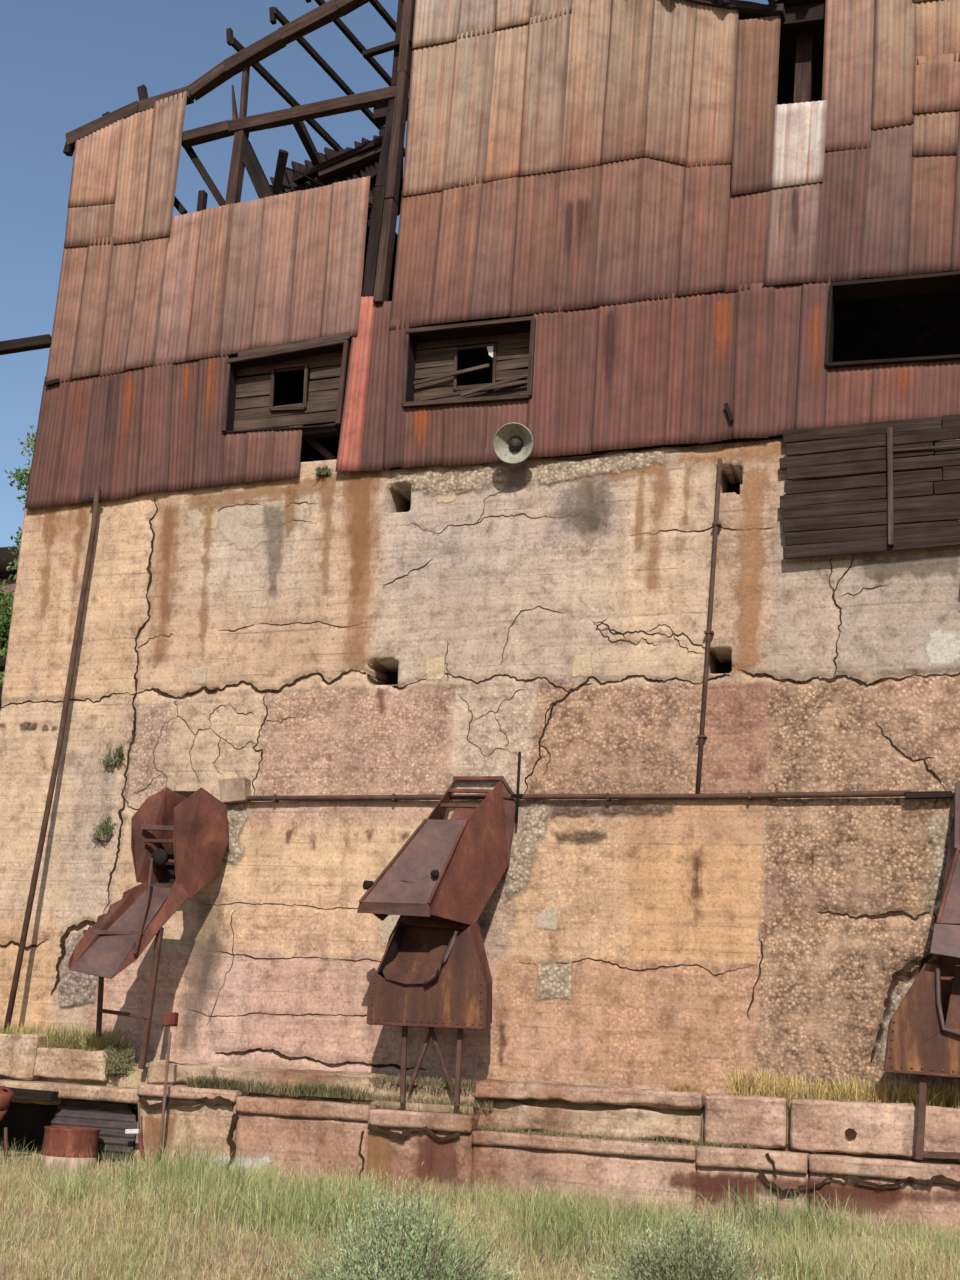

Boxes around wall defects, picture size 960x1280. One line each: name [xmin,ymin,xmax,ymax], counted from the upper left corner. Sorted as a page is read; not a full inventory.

rust [715,299,730,348]
rust [415,409,427,442]
spalling [395,465,505,494]
spalling [537,451,666,484]
crack [0,487,960,995]
spalling [504,803,673,896]
spalling [58,931,98,1007]
crack [189,902,427,1070]
crack [521,937,763,1019]
spalling [876,979,915,1061]
crack [870,954,938,1062]
crack [139,1095,239,1176]